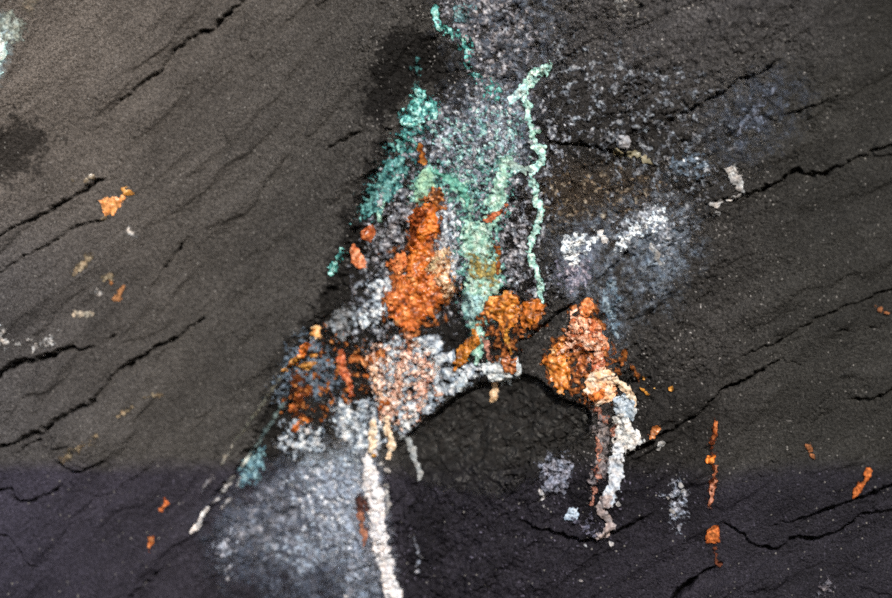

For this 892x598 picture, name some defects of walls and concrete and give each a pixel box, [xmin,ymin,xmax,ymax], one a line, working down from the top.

crack [201,9,233,33]
crack [0,179,105,236]
corrosion [99,186,134,221]
crack [0,345,84,378]
crack [127,338,176,366]
corrosion [279,323,388,434]
crack [2,423,54,446]
crack [627,430,667,456]
corrosion [705,420,718,506]
corrosion [852,467,872,499]
corrosion [705,525,723,567]
crack [673,567,711,598]